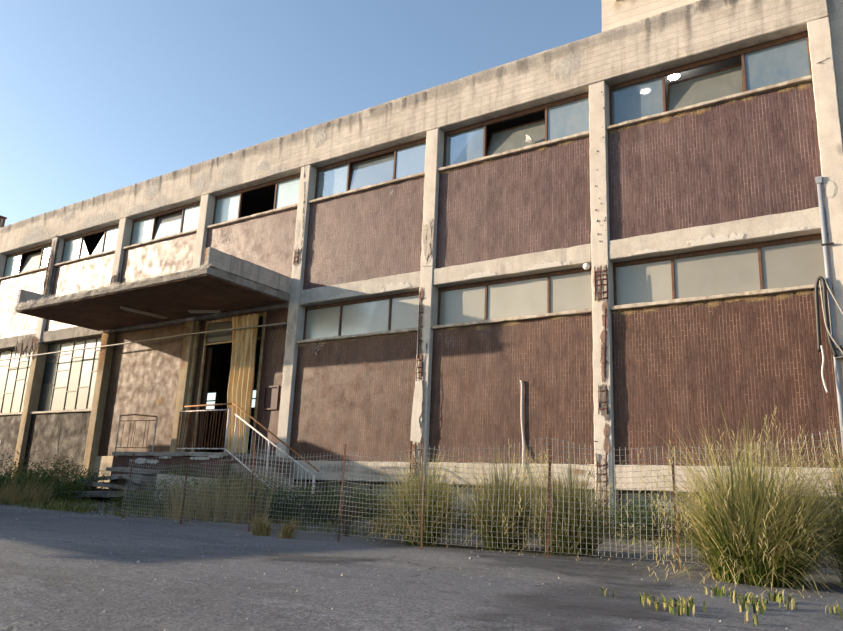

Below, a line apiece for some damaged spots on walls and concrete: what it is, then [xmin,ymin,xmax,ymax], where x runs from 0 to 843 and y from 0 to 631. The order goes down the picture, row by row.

leakage [646,5,689,29]